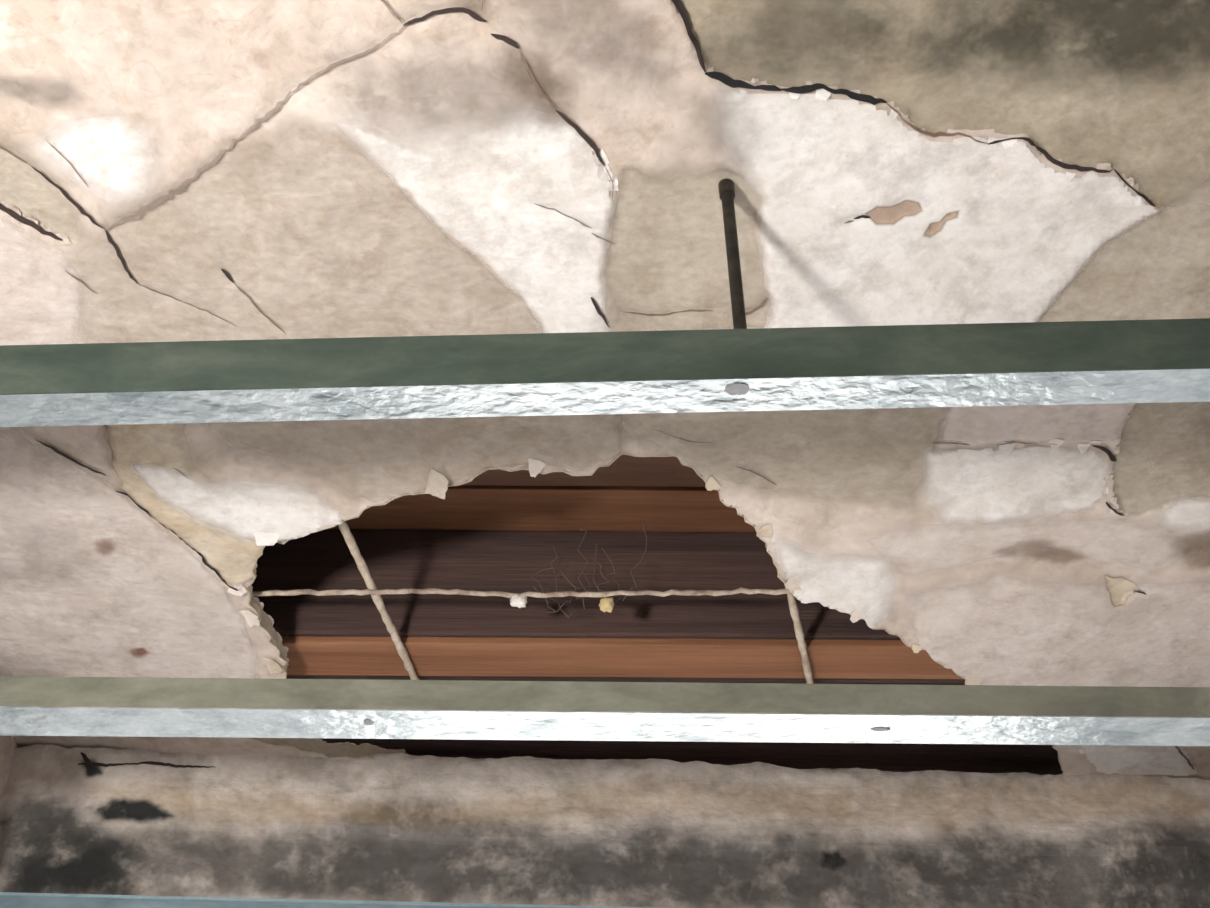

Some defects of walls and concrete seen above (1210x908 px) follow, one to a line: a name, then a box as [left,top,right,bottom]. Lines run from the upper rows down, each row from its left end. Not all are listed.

crack [0,0,614,333]
peeling [0,0,1210,346]
crack [672,0,1155,207]
leakage [946,0,1210,68]
crack [590,297,712,328]
crack [35,439,239,591]
peeling [0,434,283,678]
peeling [209,401,1210,628]
peeling [912,575,1210,687]
leakage [85,760,102,776]
leakage [3,800,896,908]
leakage [898,833,1210,908]